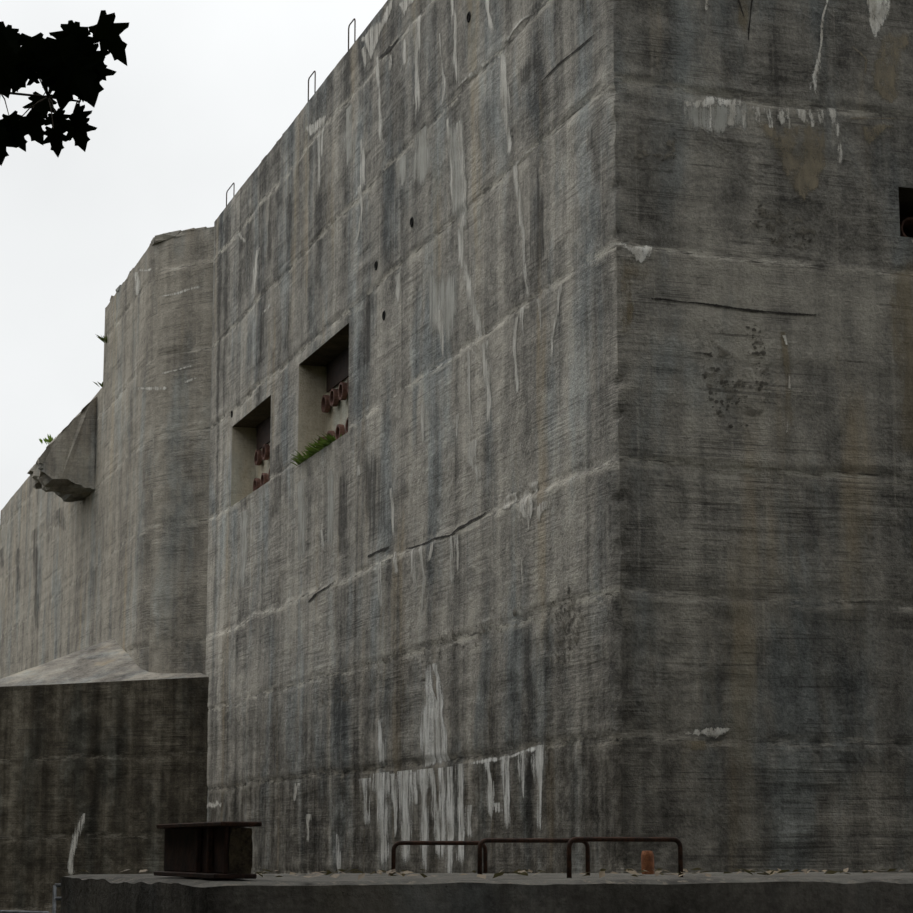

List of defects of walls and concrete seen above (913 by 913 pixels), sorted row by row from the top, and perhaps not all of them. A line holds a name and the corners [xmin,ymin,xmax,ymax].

crack [540,35,594,82]
crack [738,0,753,40]
leakage [810,0,828,94]
leakage [682,96,843,164]
leakage [439,0,544,392]
crack [649,298,819,316]
crack [368,510,490,557]
leakage [358,657,546,873]
leakage [68,813,85,874]